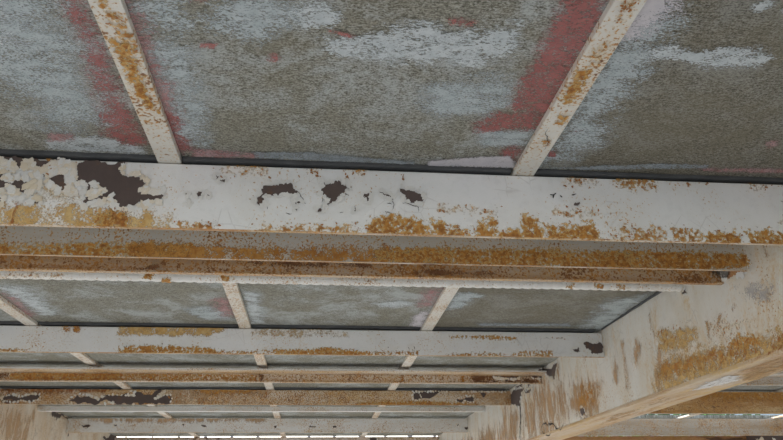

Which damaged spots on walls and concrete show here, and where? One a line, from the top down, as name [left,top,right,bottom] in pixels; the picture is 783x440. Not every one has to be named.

corrosion [98,0,160,114]
peeling [0,156,168,213]
corrosion [0,186,221,229]
peeling [251,176,427,215]
corrosion [0,203,783,283]
corrosion [117,327,420,355]
peeling [570,338,604,357]
corrosion [649,314,783,405]
peeling [0,392,41,403]
peeling [67,389,173,406]
corrosion [0,373,271,404]
peeling [455,361,558,410]